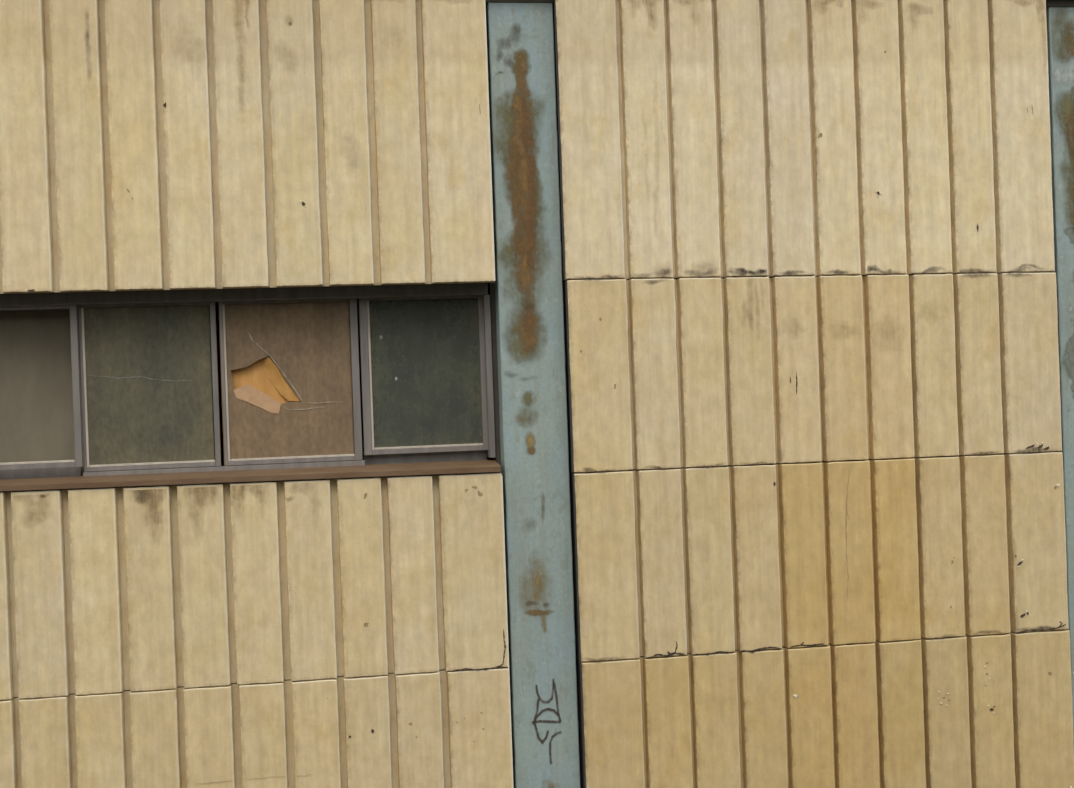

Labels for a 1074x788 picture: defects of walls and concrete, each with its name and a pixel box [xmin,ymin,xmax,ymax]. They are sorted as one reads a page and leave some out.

rust [497,52,543,362]
rust [1056,87,1074,227]
rust [526,434,535,454]
crack [843,472,851,599]
rust [527,569,549,631]